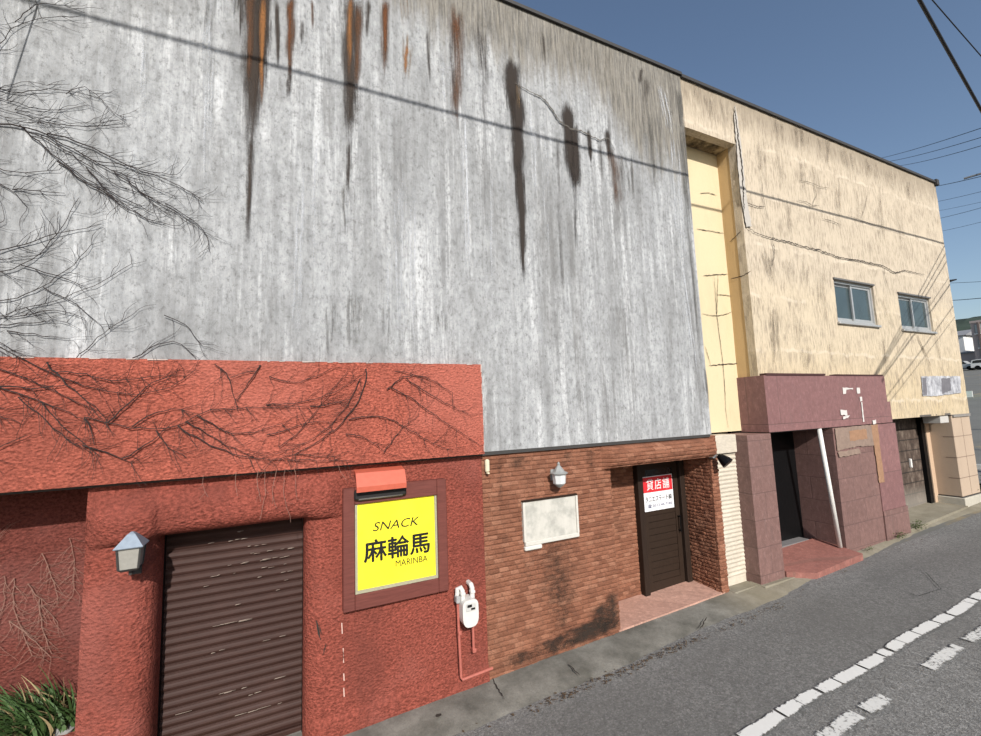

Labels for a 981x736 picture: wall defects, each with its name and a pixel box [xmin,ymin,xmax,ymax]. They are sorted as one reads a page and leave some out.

corrosion [240,0,313,224]
corrosion [343,0,370,124]
leakage [505,60,536,272]
crack [515,83,614,148]
leakage [557,104,634,198]
crack [699,107,922,283]
crack [704,272,749,422]
peeling [835,387,885,483]
leakage [543,595,619,653]